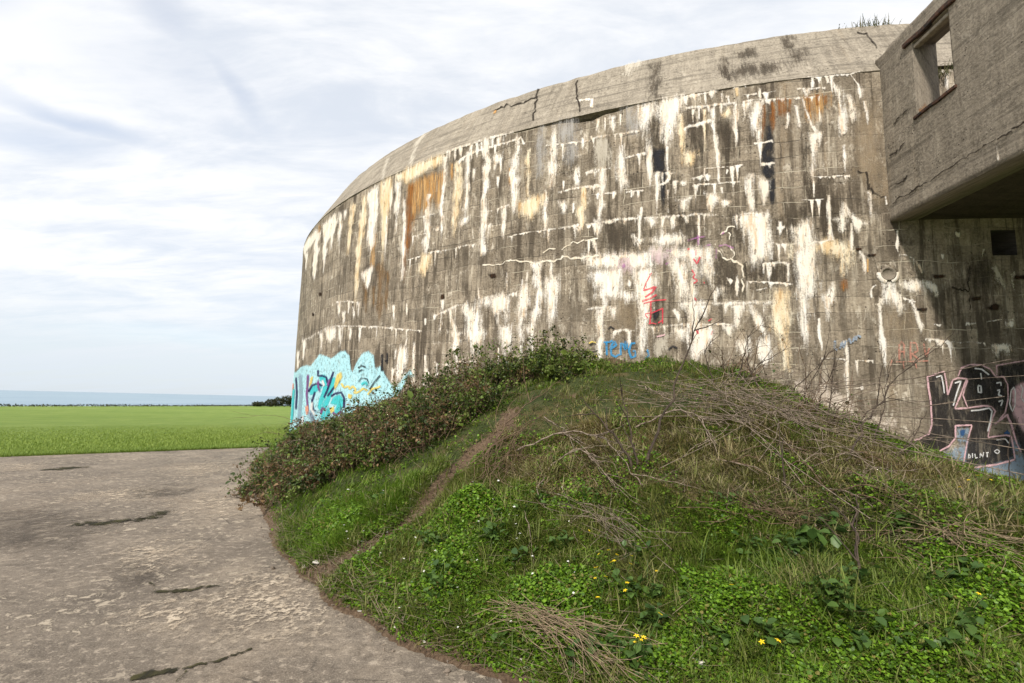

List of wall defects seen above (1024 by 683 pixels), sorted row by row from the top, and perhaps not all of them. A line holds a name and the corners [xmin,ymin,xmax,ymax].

water stain [782,35,806,63]
crack [493,89,539,120]
crack [575,80,594,112]
crack [858,110,1024,204]
rust [403,172,445,260]
water stain [296,48,961,400]